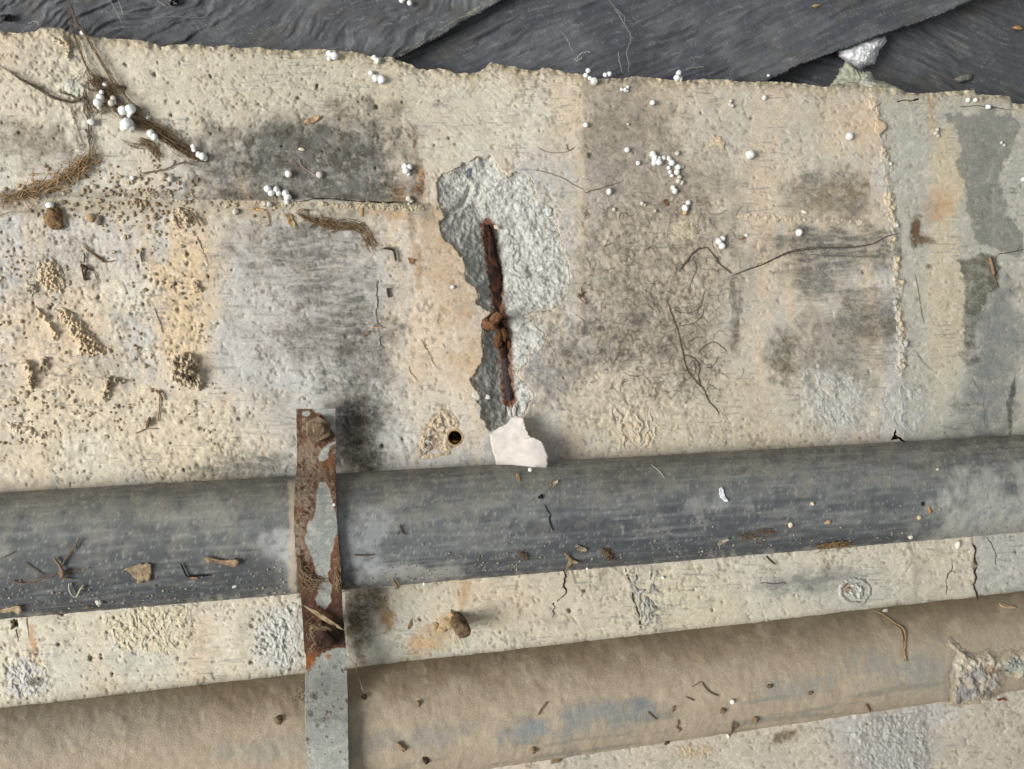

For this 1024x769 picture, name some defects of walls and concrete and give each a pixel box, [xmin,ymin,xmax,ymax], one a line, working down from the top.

damp [191,115,422,201]
damp [801,174,866,217]
damp [776,218,930,295]
damp [947,107,1023,437]
damp [268,222,387,471]
rust [465,312,508,349]
spalling [437,156,570,468]
damp [771,336,800,372]
damp [828,299,897,352]
crack [552,570,567,618]
crack [946,537,997,600]
spalling [946,638,1024,707]